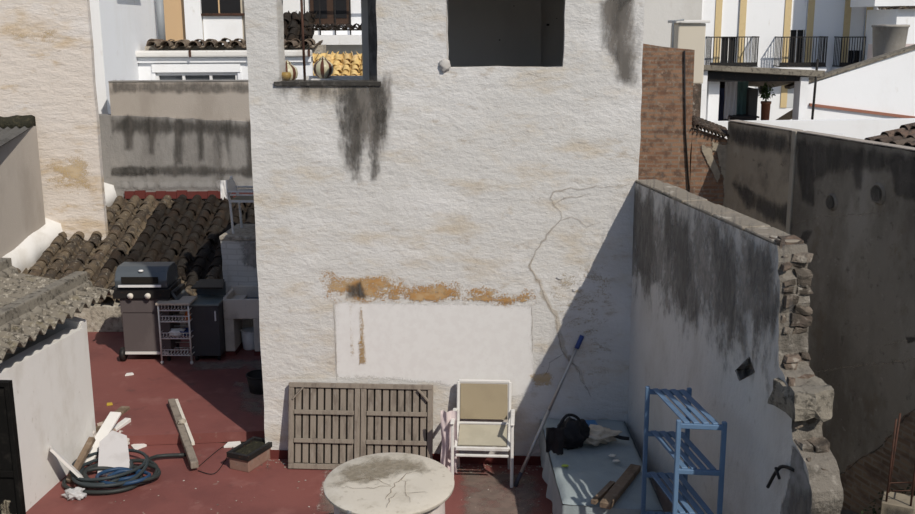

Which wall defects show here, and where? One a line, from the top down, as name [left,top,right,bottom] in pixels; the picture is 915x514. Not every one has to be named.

leakage [603,0,629,54]
leakage [47,152,97,194]
leakage [112,115,253,191]
leakage [301,80,390,179]
leakage [633,191,653,287]
leakage [664,203,697,326]
leakage [730,125,785,151]
leakage [733,184,787,227]
leakage [796,141,915,205]
flaking render [780,447,814,514]
flaking render [840,409,915,514]